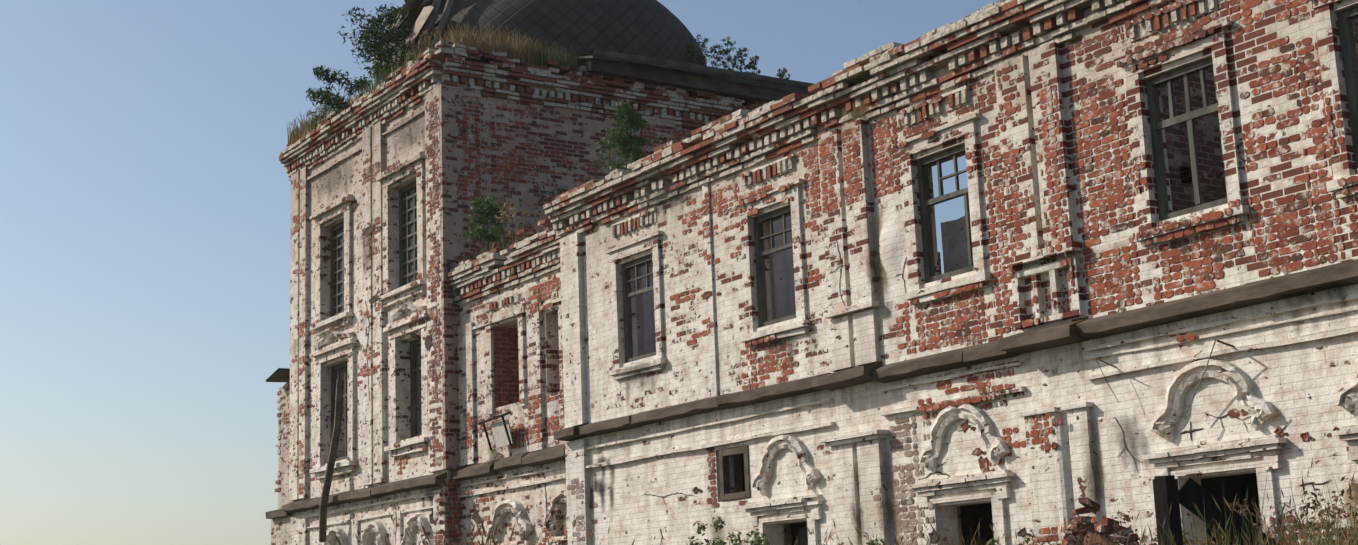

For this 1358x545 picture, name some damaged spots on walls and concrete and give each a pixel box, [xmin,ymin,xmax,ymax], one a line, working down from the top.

peeling [623,123,692,157]
peeling [639,0,1358,354]
peeling [740,334,799,390]
spalling [692,447,719,508]
peeling [873,361,1019,545]
peeling [972,412,1062,473]
peeling [1017,518,1069,545]